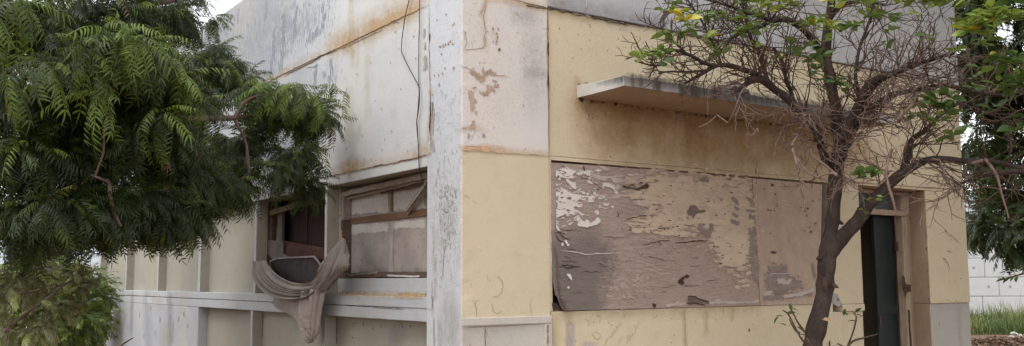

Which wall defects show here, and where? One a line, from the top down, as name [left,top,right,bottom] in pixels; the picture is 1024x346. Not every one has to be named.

peeling [463,62,502,153]
peeling [556,156,817,320]